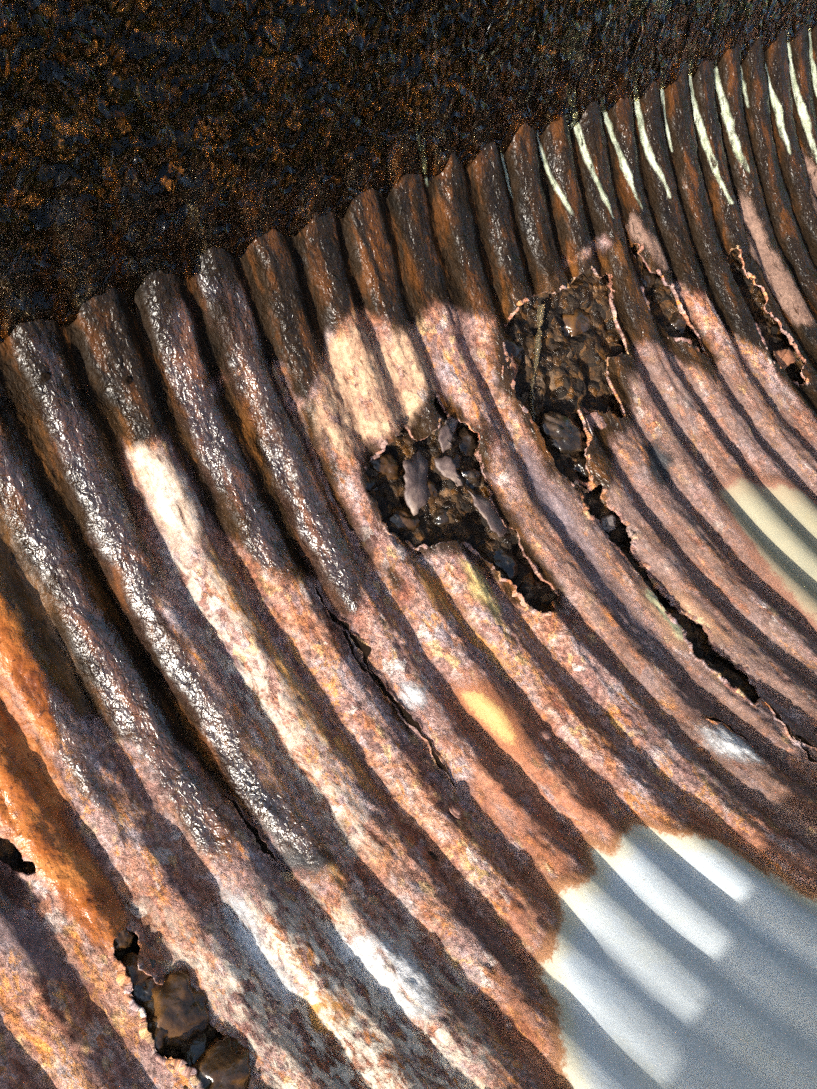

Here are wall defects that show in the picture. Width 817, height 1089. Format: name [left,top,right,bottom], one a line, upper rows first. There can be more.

rust [802,153,817,211]
rust [629,214,672,276]
rust [739,195,817,326]
peeling [502,353,518,380]
peeling [584,412,607,435]
rust [130,448,200,545]
peeling [403,423,507,537]
rust [212,550,380,796]
crack [311,572,456,788]
crack [705,716,749,742]
crack [762,699,817,765]
rust [441,675,647,977]